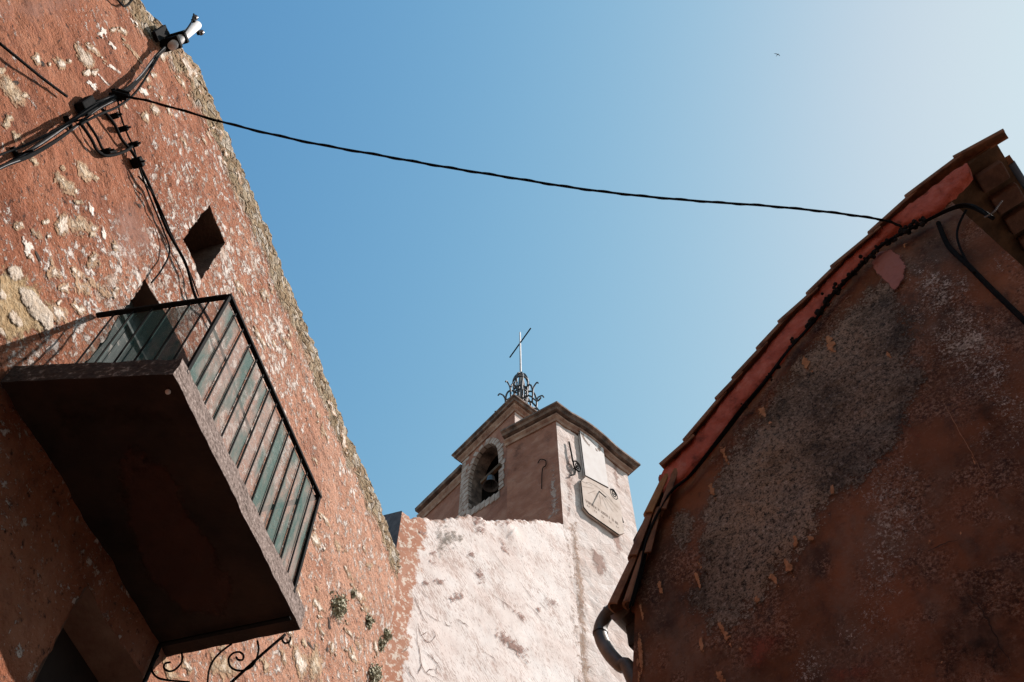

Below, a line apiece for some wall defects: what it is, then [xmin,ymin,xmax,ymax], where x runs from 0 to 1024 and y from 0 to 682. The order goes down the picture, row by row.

spalling [0,67,30,144]
spalling [32,18,173,124]
spalling [13,159,119,262]
peeling [47,251,121,325]